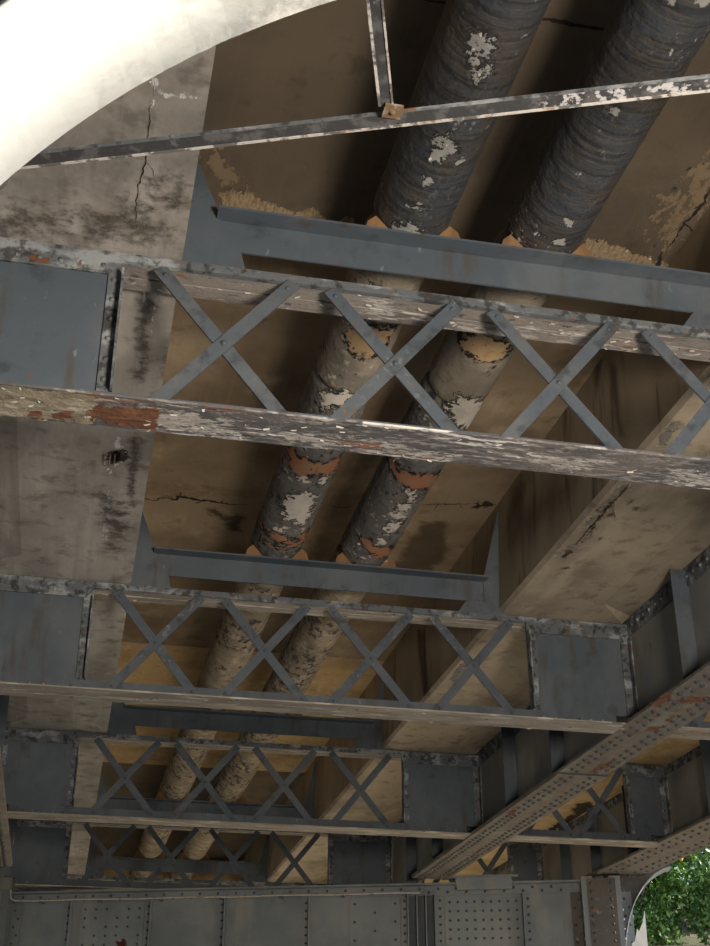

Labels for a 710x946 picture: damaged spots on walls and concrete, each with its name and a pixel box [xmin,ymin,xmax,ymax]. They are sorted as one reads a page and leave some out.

peeling [466,26,497,86]
crack [135,75,159,225]
peeling [19,89,710,224]
mould [85,205,162,239]
crack [655,191,710,266]
damp [135,292,161,379]
corrosion [28,411,74,421]
corrosion [86,404,162,432]
damp [92,435,139,545]
crack [144,492,248,505]
peeling [256,434,462,562]
peeling [528,450,610,473]